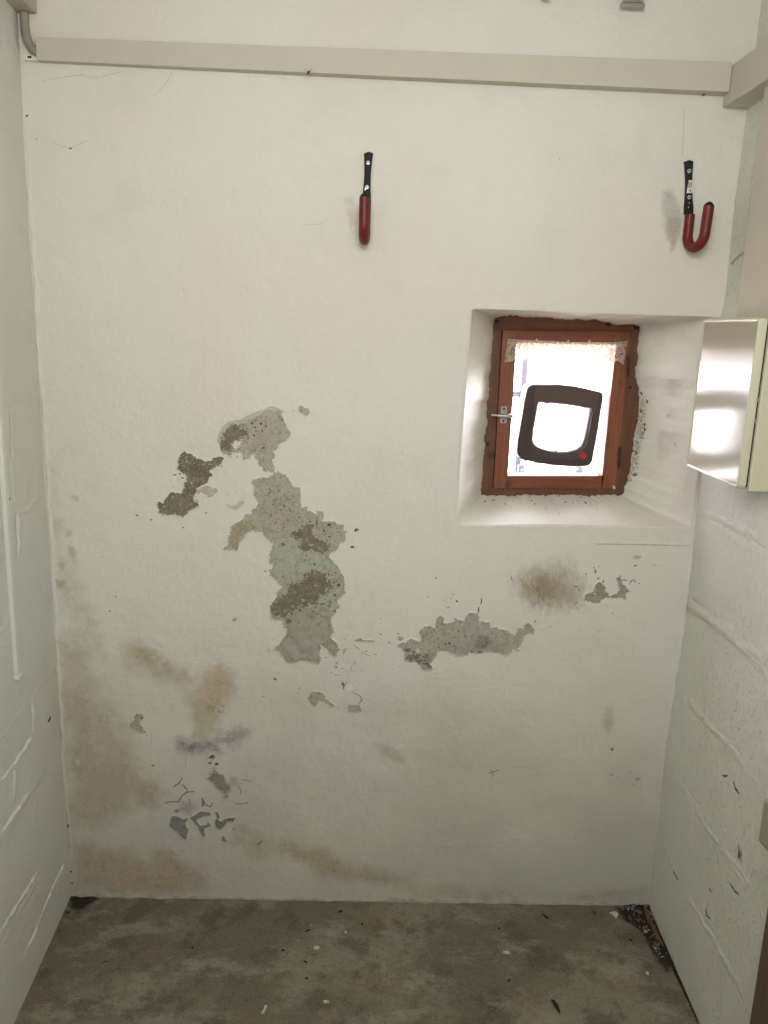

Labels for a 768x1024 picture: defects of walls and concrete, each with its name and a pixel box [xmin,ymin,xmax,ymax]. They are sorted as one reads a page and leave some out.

flaking render [156,404,375,669]
flaking render [583,566,640,604]
flaking render [396,594,537,672]
flaking render [307,690,363,713]
crack [166,758,252,807]
water stain [208,755,229,793]
peeling [167,809,237,848]